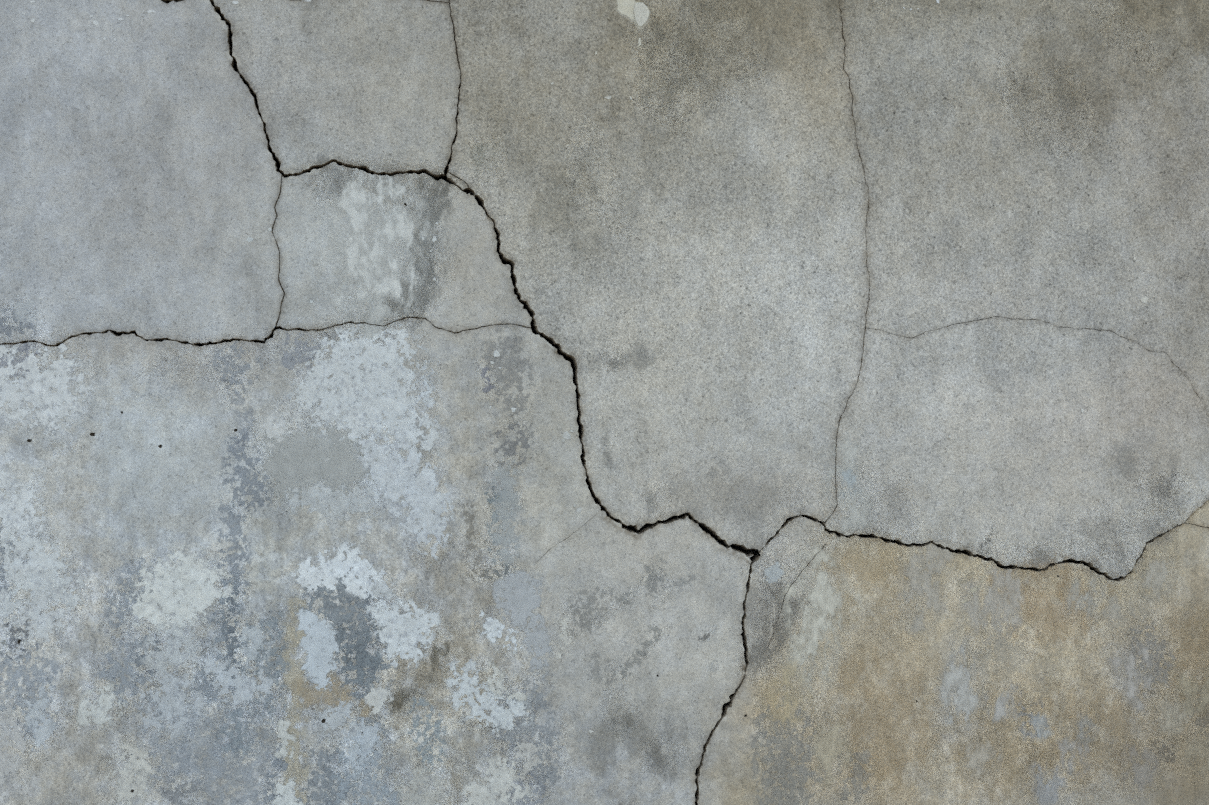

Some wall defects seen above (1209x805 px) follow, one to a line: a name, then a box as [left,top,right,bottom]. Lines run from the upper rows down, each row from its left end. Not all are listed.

peeling [615,0,651,46]
crack [836,0,1071,448]
crack [0,0,761,805]
crack [1083,328,1185,376]
crack [758,458,1209,582]
crack [767,544,826,649]